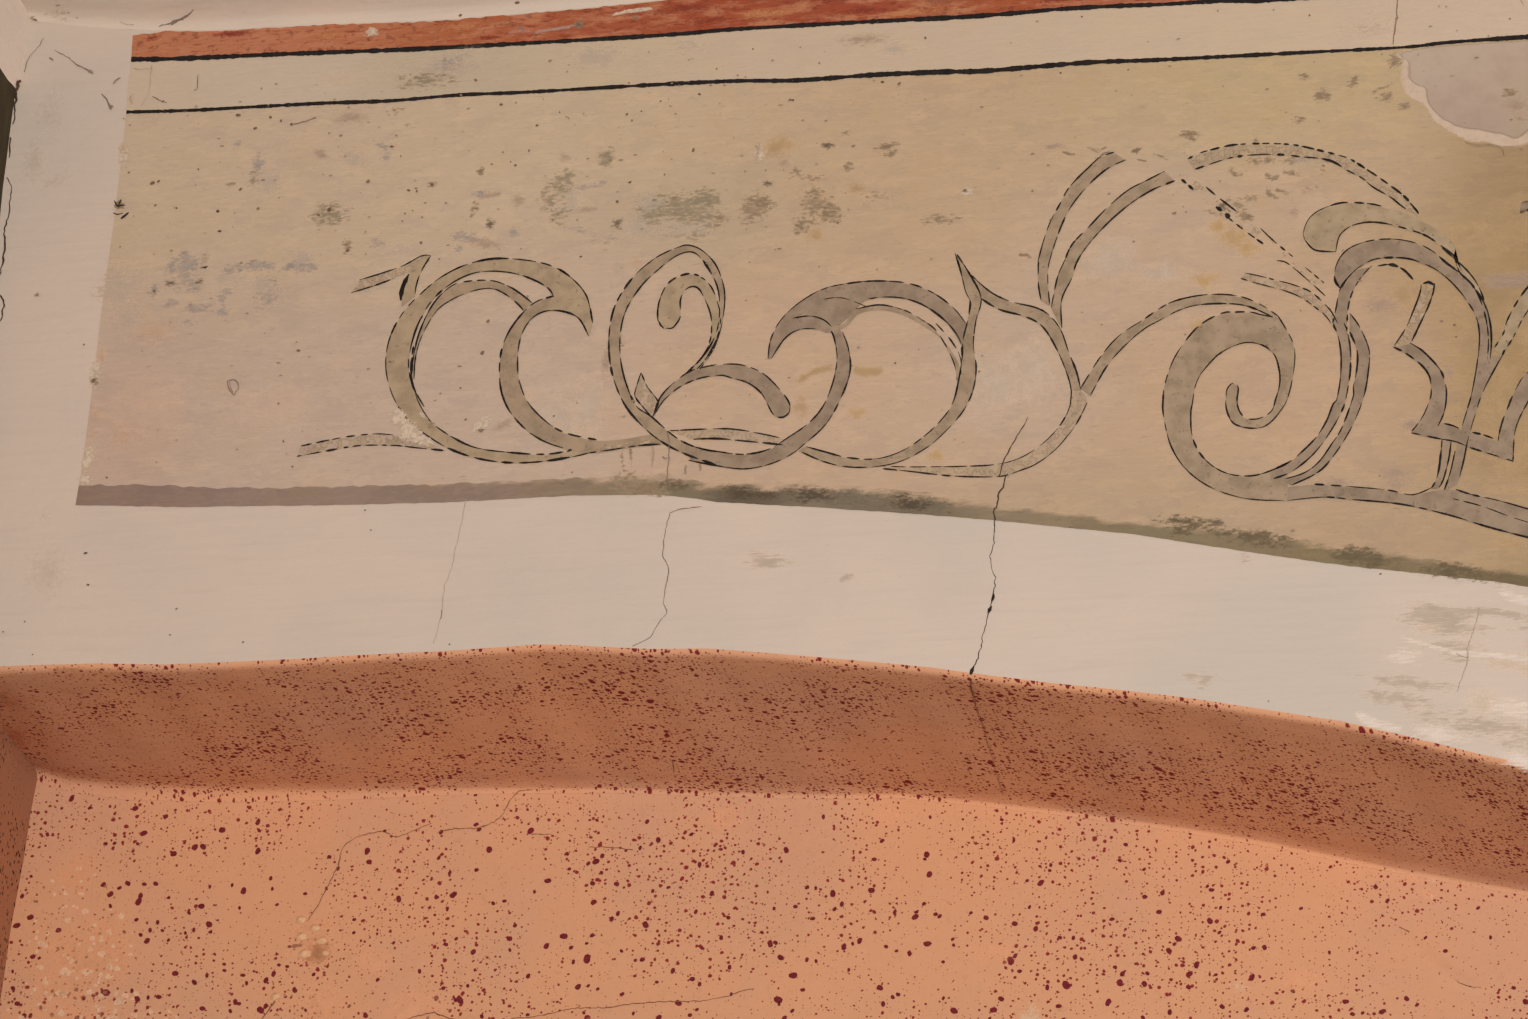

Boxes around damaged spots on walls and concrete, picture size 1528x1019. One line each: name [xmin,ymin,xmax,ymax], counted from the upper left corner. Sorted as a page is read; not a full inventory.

crack [1391,0,1399,44]
peeling [1397,41,1528,154]
water stain [540,146,775,244]
water stain [769,138,842,238]
water stain [873,142,900,157]
crack [433,499,466,644]
crack [633,431,701,646]
water stain [723,485,779,502]
crack [970,417,1028,792]
water stain [1154,514,1295,549]
water stain [1331,545,1385,568]
water stain [1421,562,1512,583]